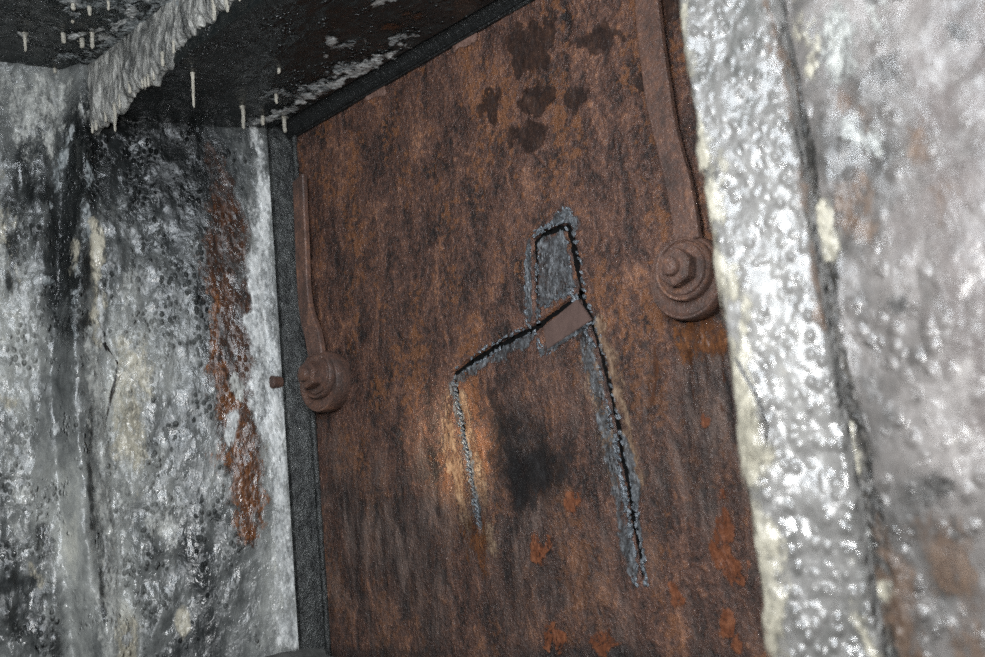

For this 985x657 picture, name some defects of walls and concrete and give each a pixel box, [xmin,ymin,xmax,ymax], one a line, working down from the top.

efflorescence [54,0,179,63]
efflorescence [794,1,857,84]
efflorescence [841,116,882,157]
water stain [0,70,138,348]
efflorescence [817,199,840,261]
corrosion [198,143,269,547]
corrosion [660,316,729,368]
efflorescence [696,120,787,657]
corrosion [530,533,552,564]
corrosion [708,489,750,586]
corrosion [543,621,567,654]
corrosion [719,608,743,654]